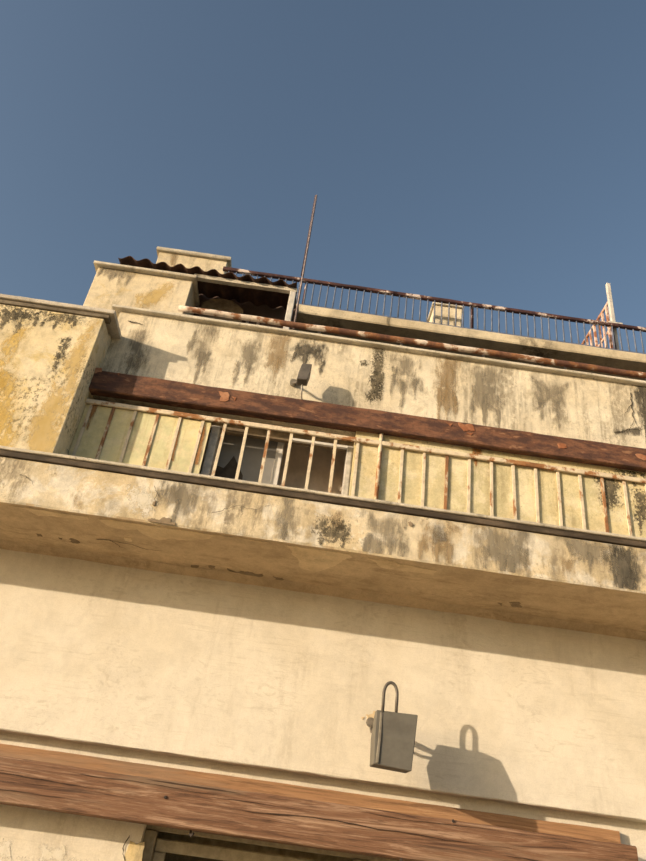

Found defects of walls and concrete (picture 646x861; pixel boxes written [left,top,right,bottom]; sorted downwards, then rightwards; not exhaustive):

water stain [0,305,98,453]
water stain [264,337,328,374]
water stain [360,348,423,407]
water stain [437,358,460,419]
water stain [471,366,500,424]
crack [614,393,642,433]
water stain [613,386,646,436]
mould [596,469,646,535]
mould [311,518,351,548]
water stain [363,515,408,557]
water stain [482,527,527,573]
water stain [559,537,640,591]